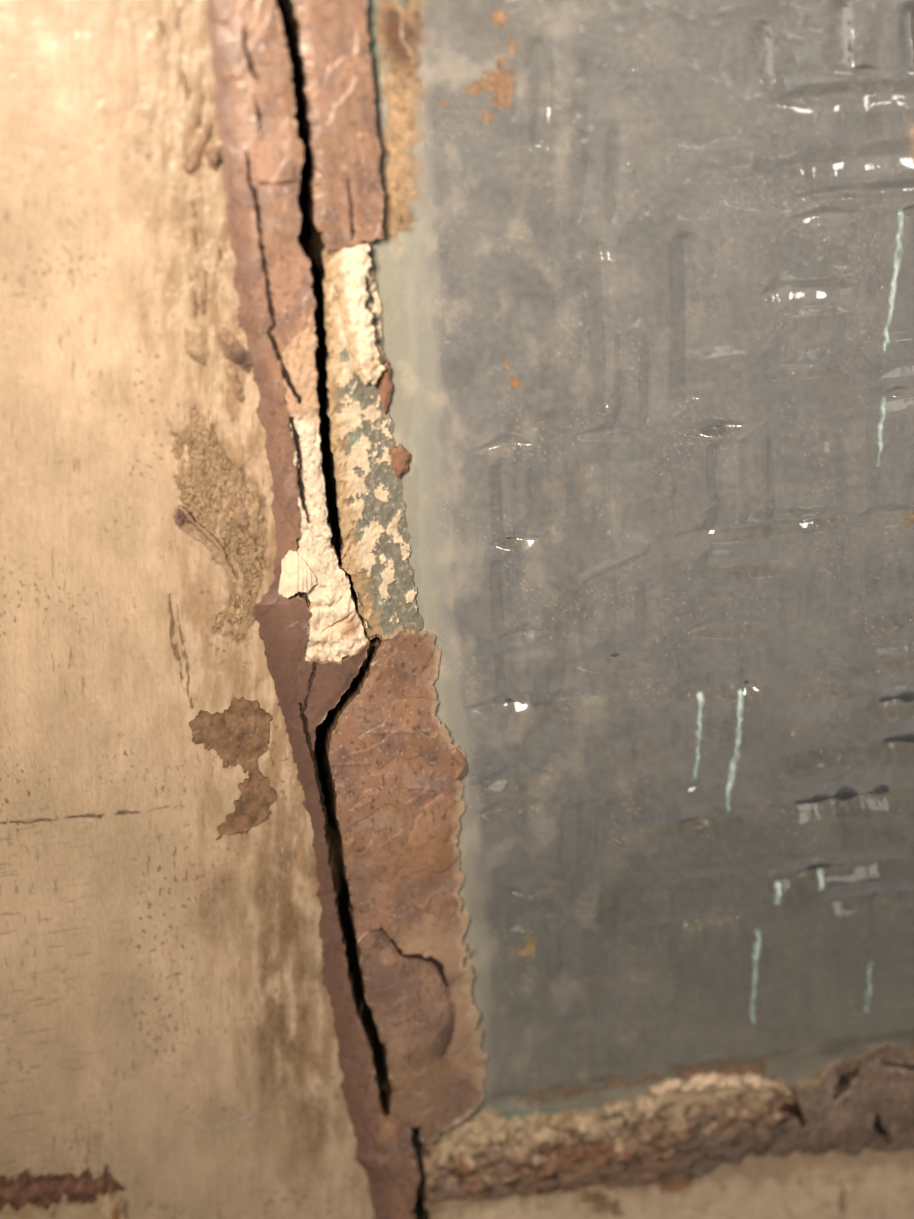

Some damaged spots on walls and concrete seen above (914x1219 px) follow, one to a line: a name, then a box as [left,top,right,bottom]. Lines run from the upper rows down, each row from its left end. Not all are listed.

rust [464,40,516,123]
rust [375,0,424,238]
peeling [378,360,392,414]
peeling [391,443,410,479]
peeling [279,550,317,598]
crack [243,0,393,1116]
crack [833,1061,914,1100]
crack [874,1114,892,1147]
rust [0,1165,125,1211]
crack [411,1127,430,1219]